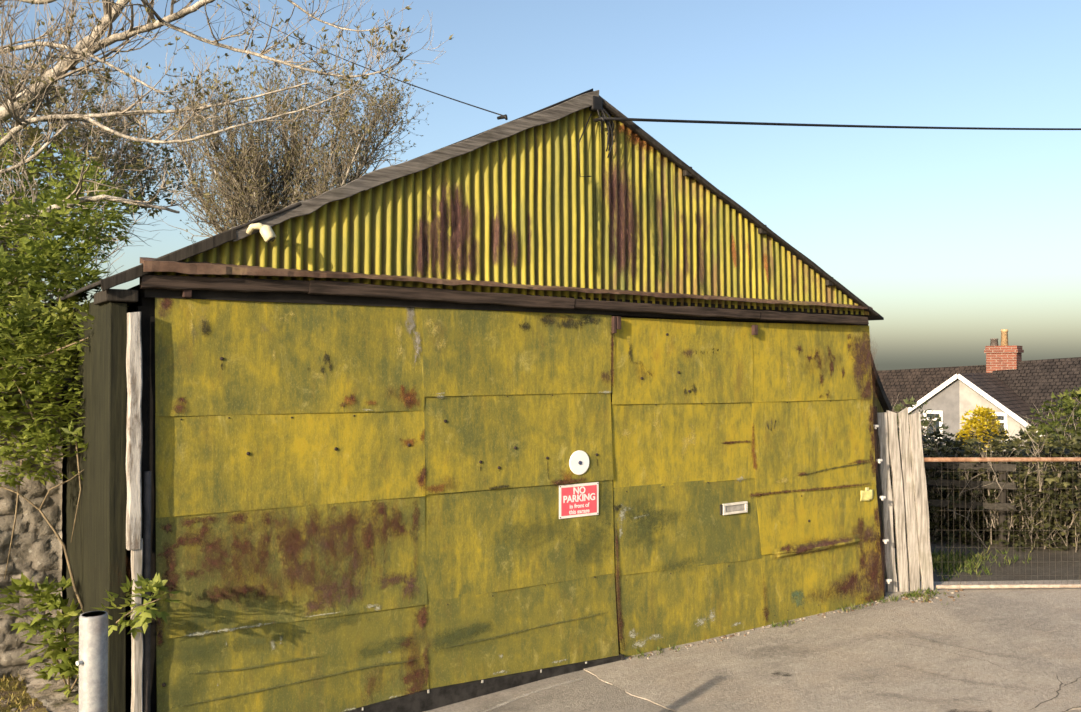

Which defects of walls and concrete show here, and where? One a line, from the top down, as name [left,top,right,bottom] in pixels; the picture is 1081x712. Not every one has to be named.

corrosion [415,189,477,274]
corrosion [603,167,640,277]
corrosion [682,213,705,279]
corrosion [751,333,876,496]
corrosion [159,502,420,612]
corrosion [615,535,624,643]
corrosion [781,508,884,603]
crack [911,644,1081,712]